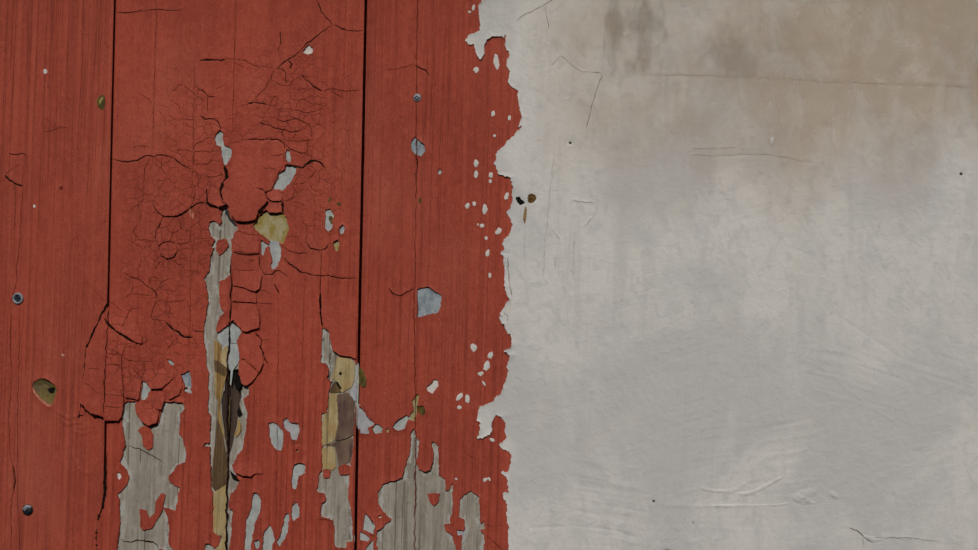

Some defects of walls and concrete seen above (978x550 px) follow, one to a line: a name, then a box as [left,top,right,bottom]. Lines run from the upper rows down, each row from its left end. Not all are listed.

peeling [117,359,192,550]
crack [78,0,363,550]
peeling [151,130,305,550]
peeling [325,196,345,251]
peeling [317,296,485,550]
peeling [411,137,425,156]
peeling [417,287,442,317]
spalling [516,194,536,223]